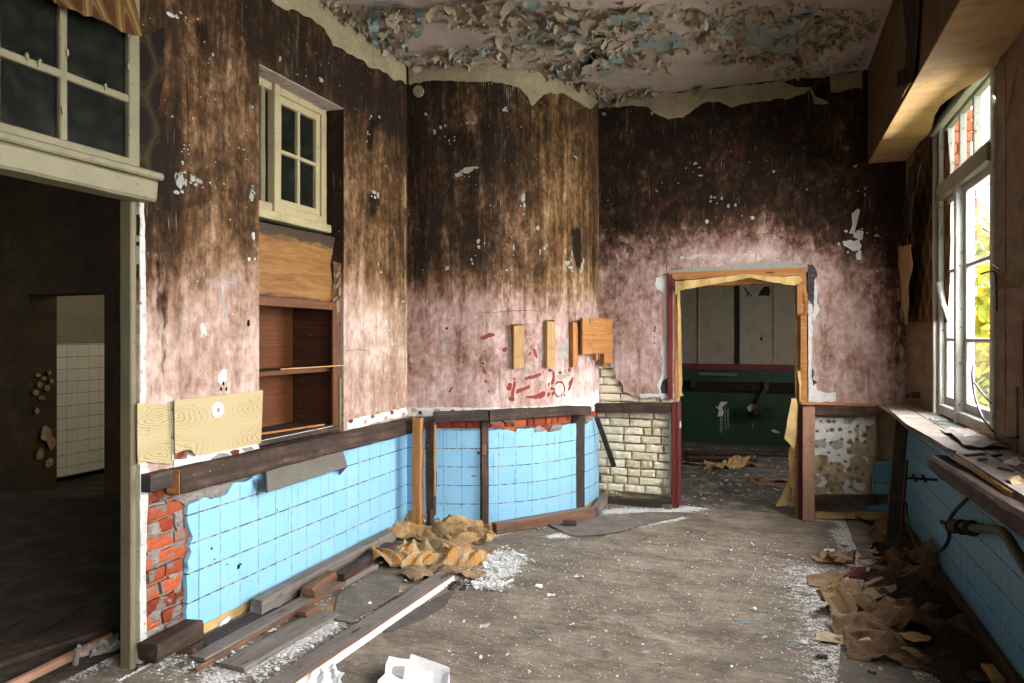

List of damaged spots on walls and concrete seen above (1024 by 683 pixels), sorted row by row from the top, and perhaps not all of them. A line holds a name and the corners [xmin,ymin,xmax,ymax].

peeling [324,0,881,116]
peeling [173,144,204,194]
leakage [572,229,581,266]
peeling [838,209,880,260]
leakage [157,262,166,324]
flaking render [346,247,807,498]
spalling [815,415,877,494]
flaking render [136,481,232,631]